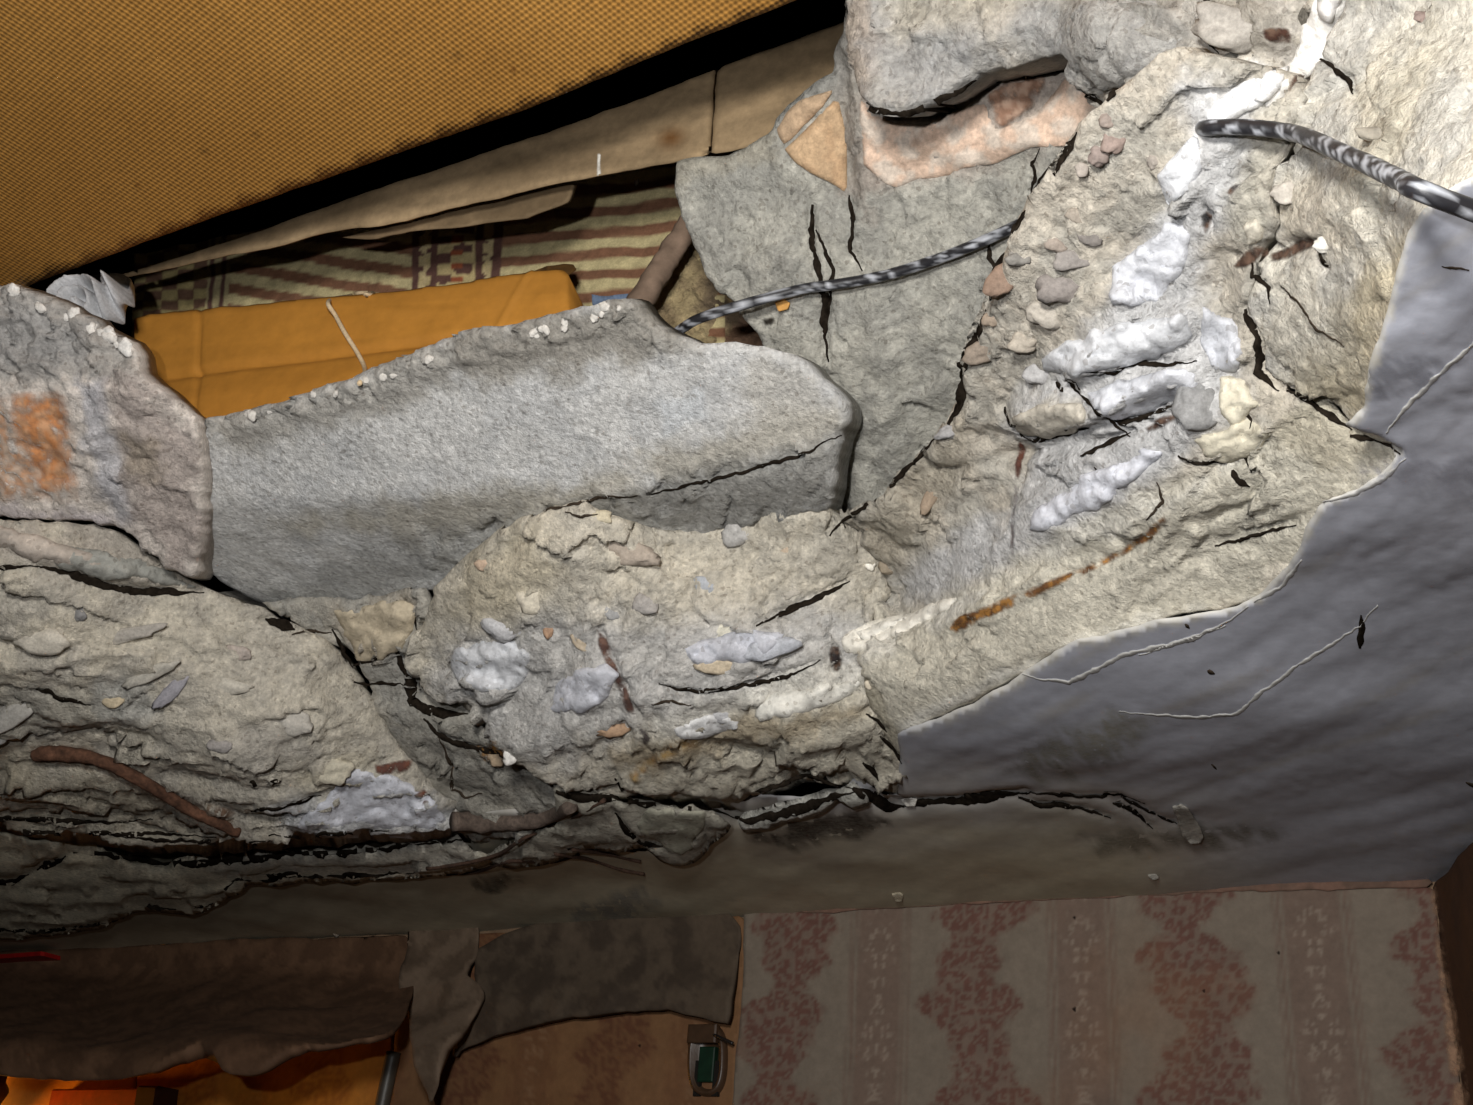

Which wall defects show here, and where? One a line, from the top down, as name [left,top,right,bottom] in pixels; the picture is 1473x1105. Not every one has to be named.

flaking render [777,90,847,191]
flaking render [0,397,71,494]
crack [808,195,863,362]
crack [829,132,1077,536]
crack [1004,360,1197,489]
spalling [840,0,1473,755]
crack [1243,263,1401,455]
rust [951,518,1164,631]
rust [30,745,242,837]
spalling [0,500,957,940]
crack [552,713,1177,853]
peeling [1437,942,1468,1105]